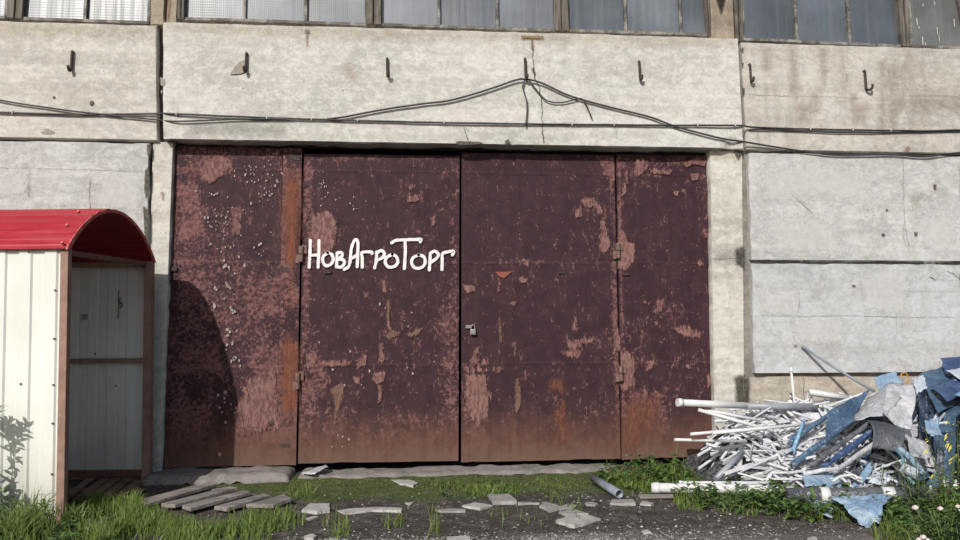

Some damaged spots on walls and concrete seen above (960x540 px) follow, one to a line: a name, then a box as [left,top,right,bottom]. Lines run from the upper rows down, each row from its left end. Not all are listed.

peeling [201,156,233,183]
peeling [620,158,672,197]
peeling [684,159,707,181]
peeling [575,197,635,270]
peeling [306,280,422,424]
peeling [644,296,667,326]
peeling [674,325,704,338]
peeling [234,369,282,438]
peeling [460,346,503,428]
peeling [514,371,527,413]